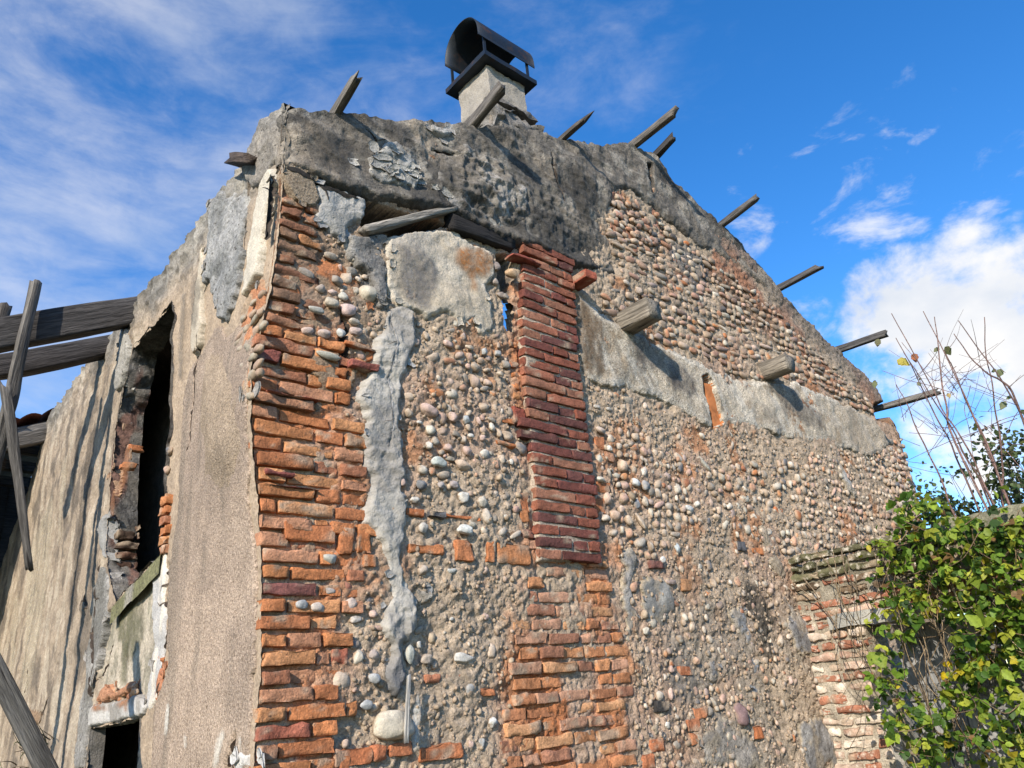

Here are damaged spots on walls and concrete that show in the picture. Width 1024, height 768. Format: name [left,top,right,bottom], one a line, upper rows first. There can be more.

flaking render [114,329,141,391]
flaking render [190,162,494,418]
damp [10,504,60,697]
damp [62,429,95,620]
flaking render [74,510,169,768]
spalling [107,444,144,497]
flaking render [230,746,265,768]